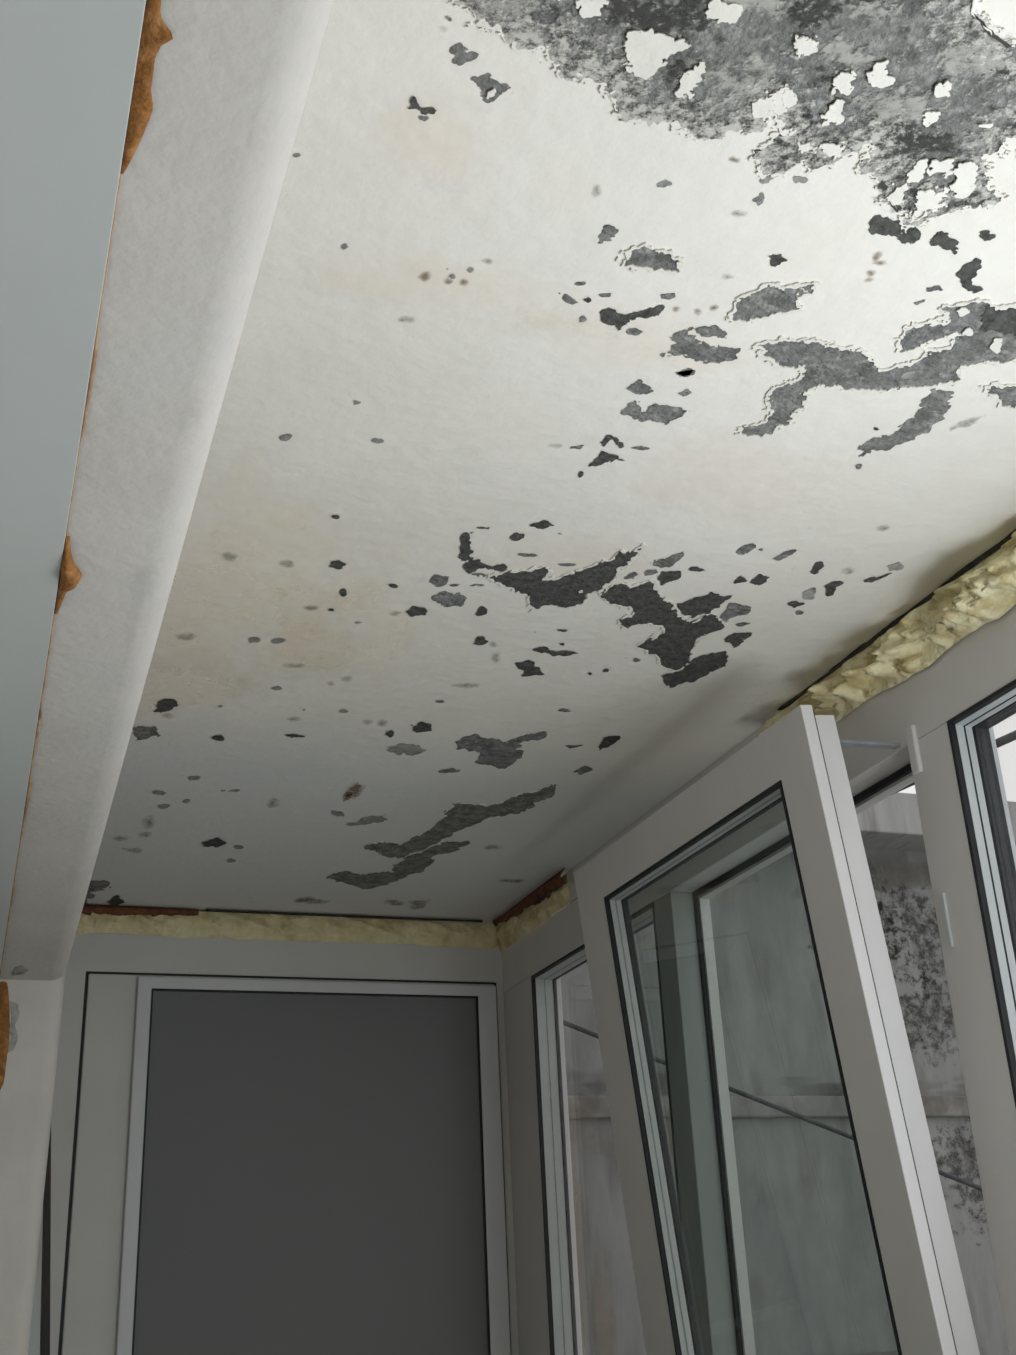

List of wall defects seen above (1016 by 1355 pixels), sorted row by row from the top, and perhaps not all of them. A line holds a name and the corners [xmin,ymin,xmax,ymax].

peeling [408,97,437,121]
peeling [445,0,1016,469]
peeling [329,560,346,570]
peeling [406,520,770,688]
peeling [736,543,797,561]
peeling [788,562,851,615]
peeling [864,562,904,583]
peeling [381,722,432,756]
peeling [455,731,547,769]
peeling [599,736,620,750]
peeling [326,784,559,889]